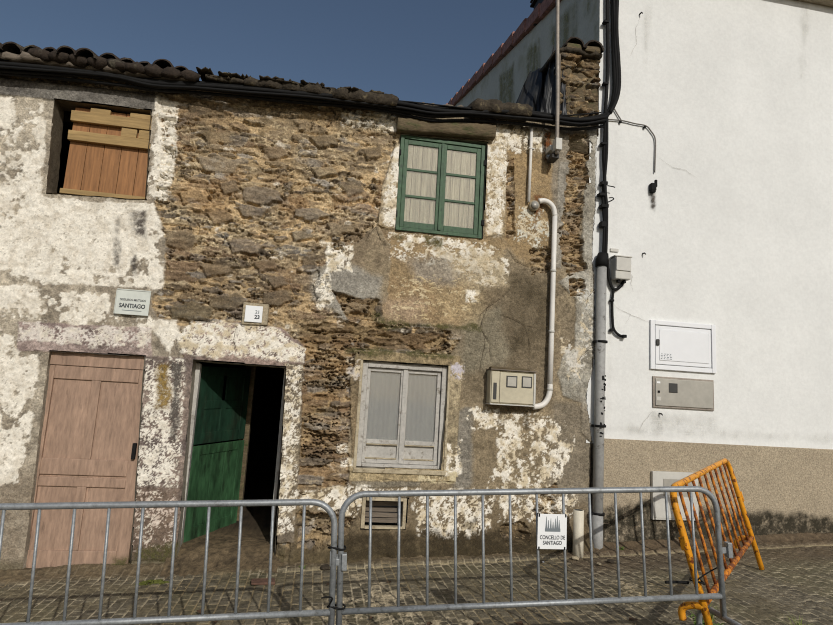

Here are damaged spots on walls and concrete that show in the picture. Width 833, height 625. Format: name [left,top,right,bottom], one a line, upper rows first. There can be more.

peeling [0,95,596,551]
crack [478,296,529,366]
leakage [603,502,833,543]